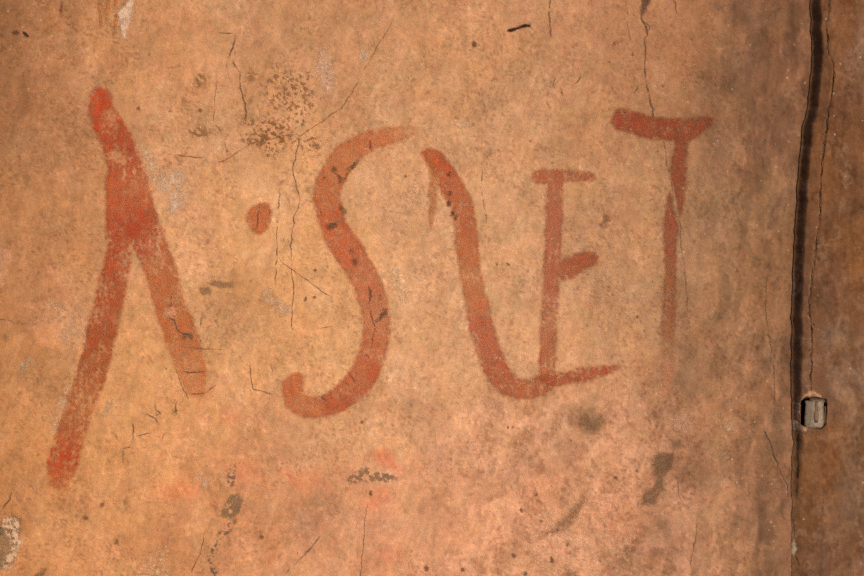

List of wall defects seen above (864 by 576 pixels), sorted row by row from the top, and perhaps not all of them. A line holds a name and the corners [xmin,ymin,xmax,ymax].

crack [179,83,234,162]
crack [223,33,247,120]
crack [628,17,654,115]
crack [251,83,358,327]
crack [808,0,835,379]
spalling [0,516,24,569]